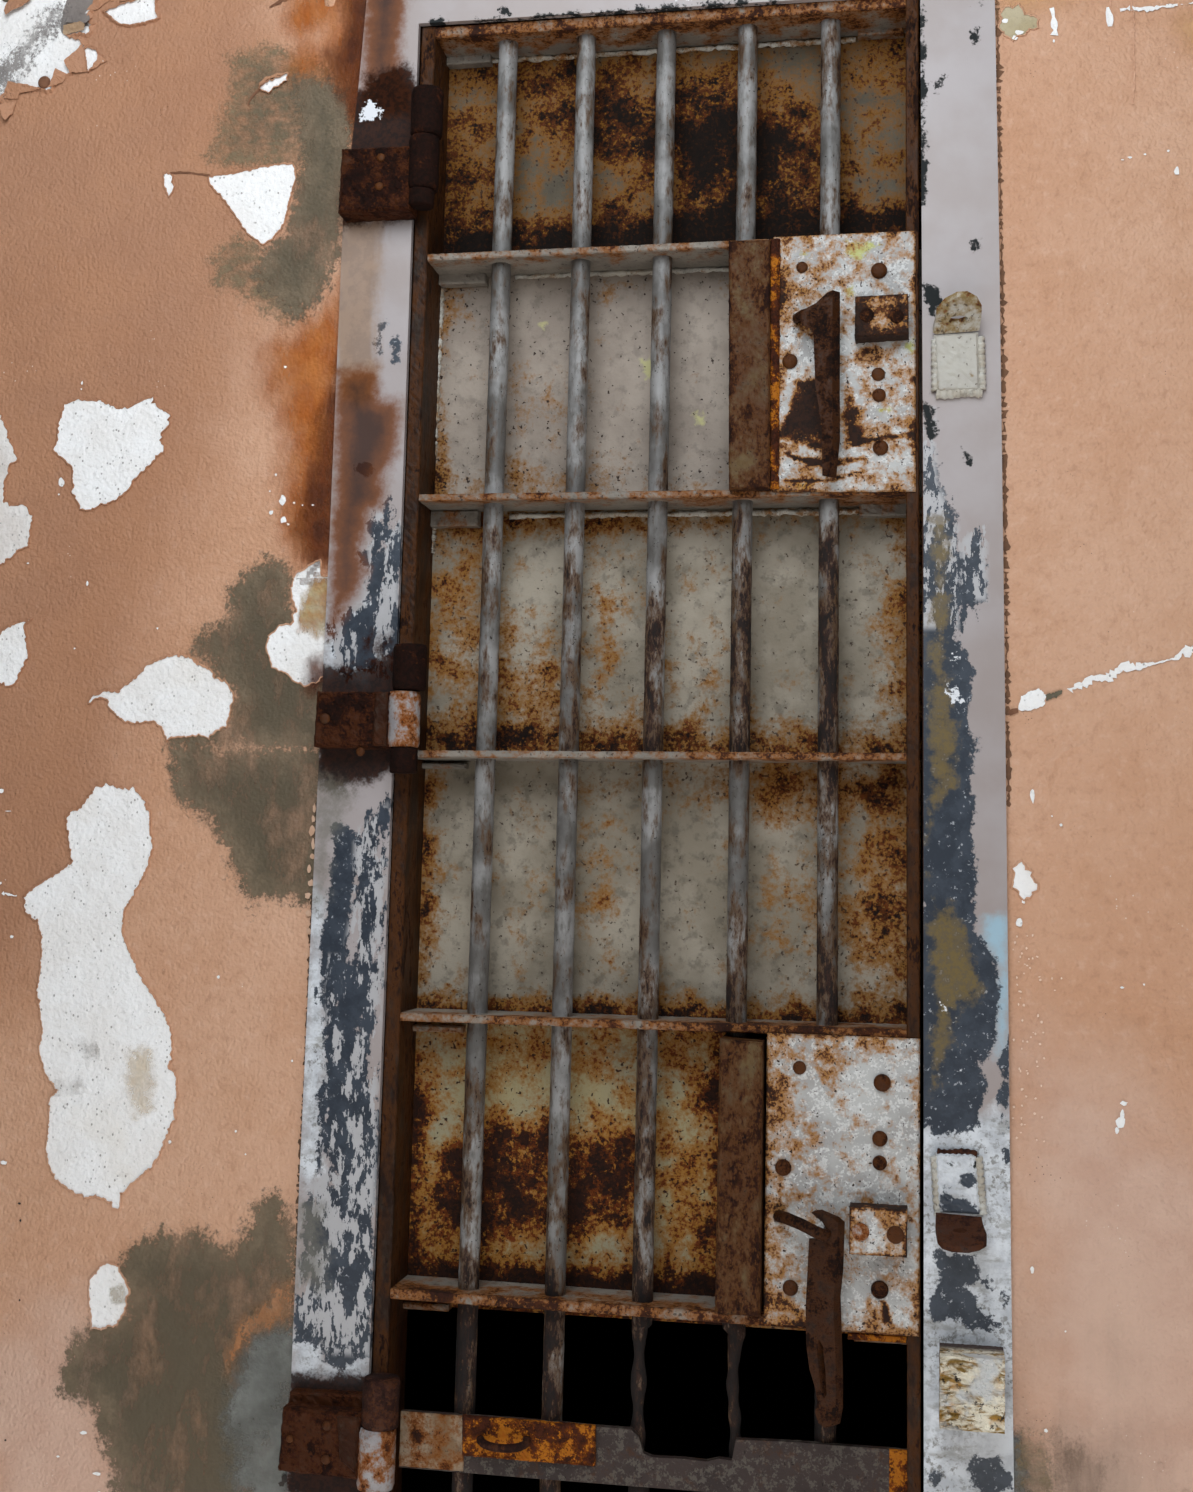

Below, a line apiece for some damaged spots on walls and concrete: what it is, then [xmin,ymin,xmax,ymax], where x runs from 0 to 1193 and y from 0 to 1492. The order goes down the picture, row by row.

peeling [0,0,161,120]
peeling [207,162,297,246]
damp [204,40,354,322]
rust [291,0,367,123]
peeling [0,412,34,565]
peeling [52,381,172,512]
rust [273,309,339,561]
crack [995,0,1193,807]
peeling [87,653,234,742]
damp [162,552,323,907]
peeling [23,781,179,1210]
damp [56,1186,297,1492]